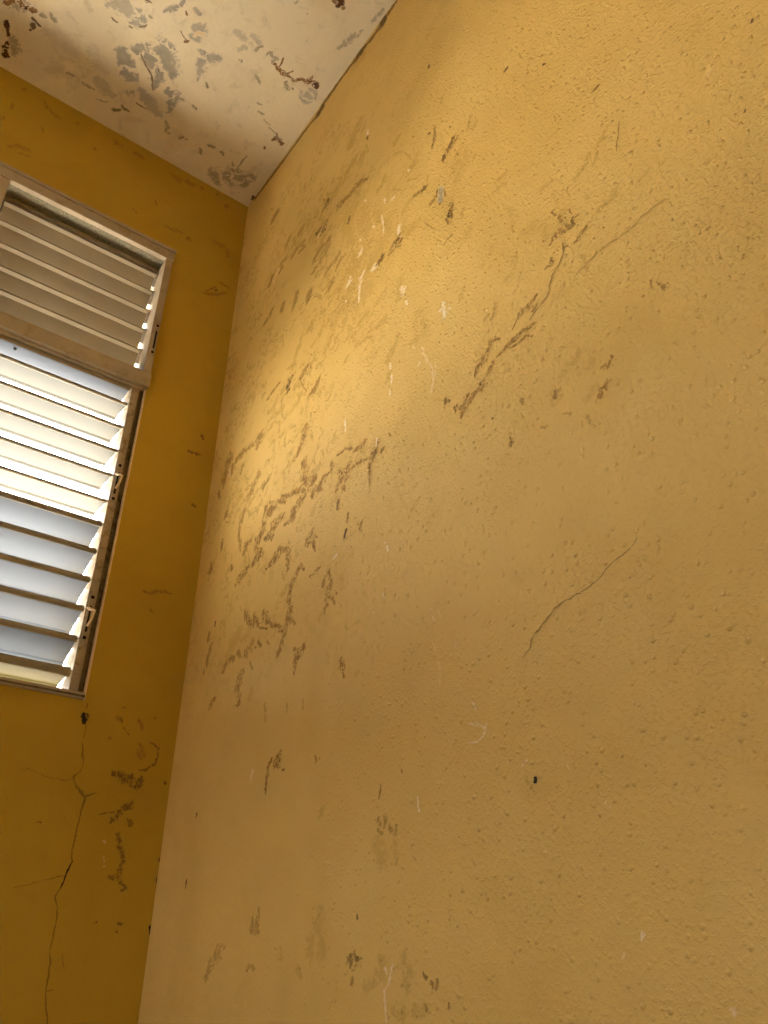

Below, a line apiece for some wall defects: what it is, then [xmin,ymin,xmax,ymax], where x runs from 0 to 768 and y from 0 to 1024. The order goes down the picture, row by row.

damp [35,10,113,91]
damp [198,142,259,201]
crack [529,198,667,321]
peeling [247,361,322,420]
peeling [203,421,392,709]
crack [523,538,637,657]
crack [13,725,96,1024]
peeling [99,741,160,892]